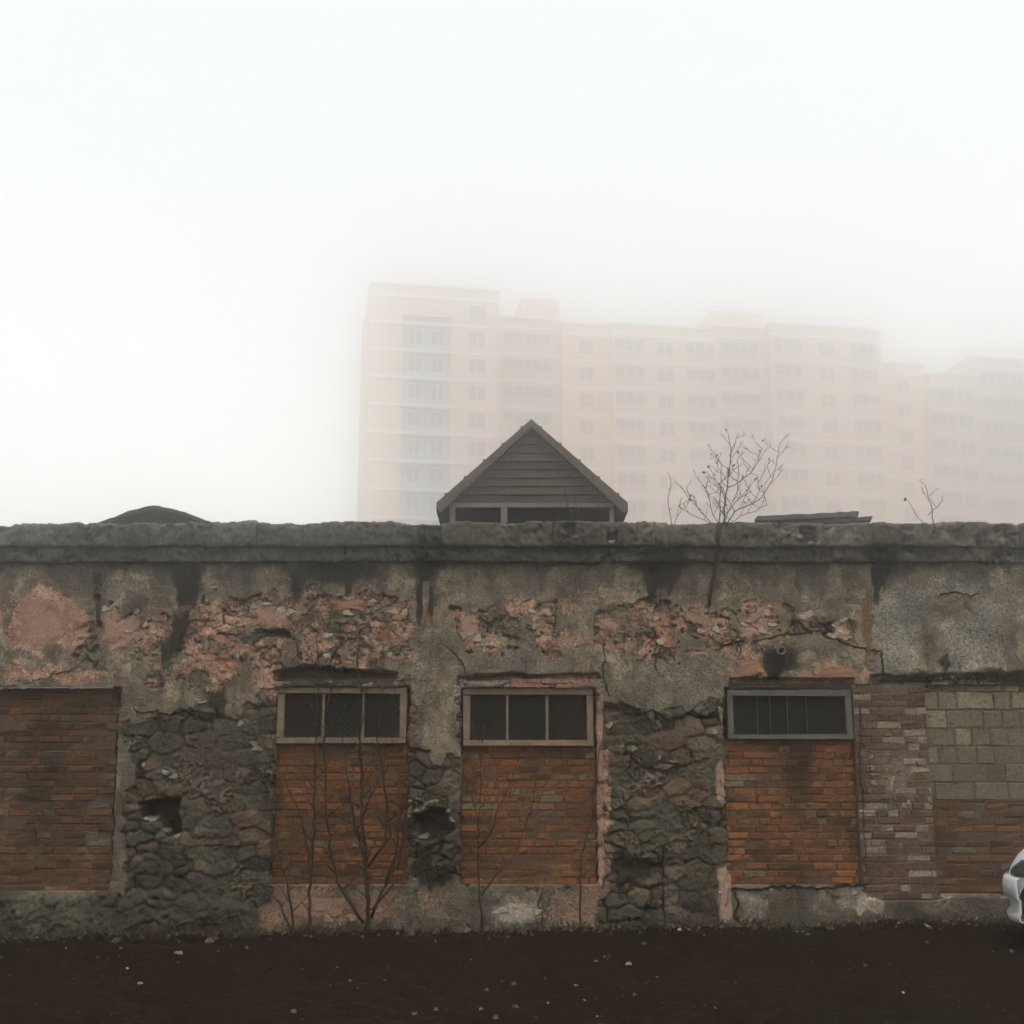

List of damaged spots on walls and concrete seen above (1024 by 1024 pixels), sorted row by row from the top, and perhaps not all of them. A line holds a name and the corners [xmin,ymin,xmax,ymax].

leakage [637,538,688,607]
leakage [865,540,899,604]
peeling [99,606,148,653]
leakage [161,567,203,663]
peeling [250,602,295,637]
peeling [323,597,408,625]
peeling [640,606,675,649]
peeling [739,607,778,642]
peeling [827,617,853,640]
crack [939,586,980,615]
spalling [278,632,405,681]
crack [714,618,1019,923]